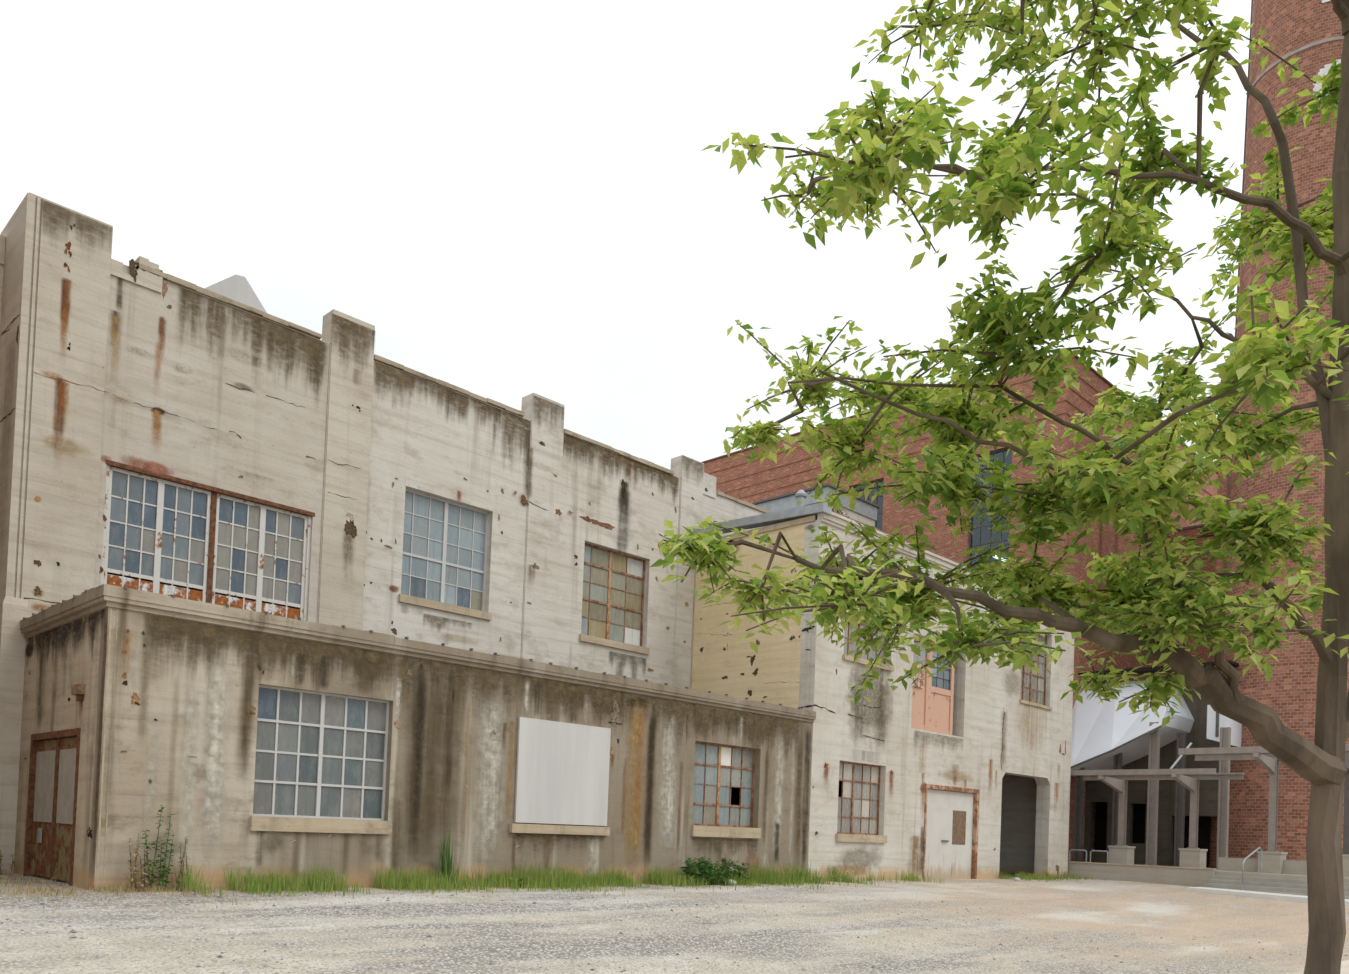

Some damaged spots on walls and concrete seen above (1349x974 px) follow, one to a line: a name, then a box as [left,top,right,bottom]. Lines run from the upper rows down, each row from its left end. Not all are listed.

rust [62,224,75,335]
rust [56,378,67,431]
damp [181,288,564,493]
damp [147,614,809,867]
damp [513,833,593,876]